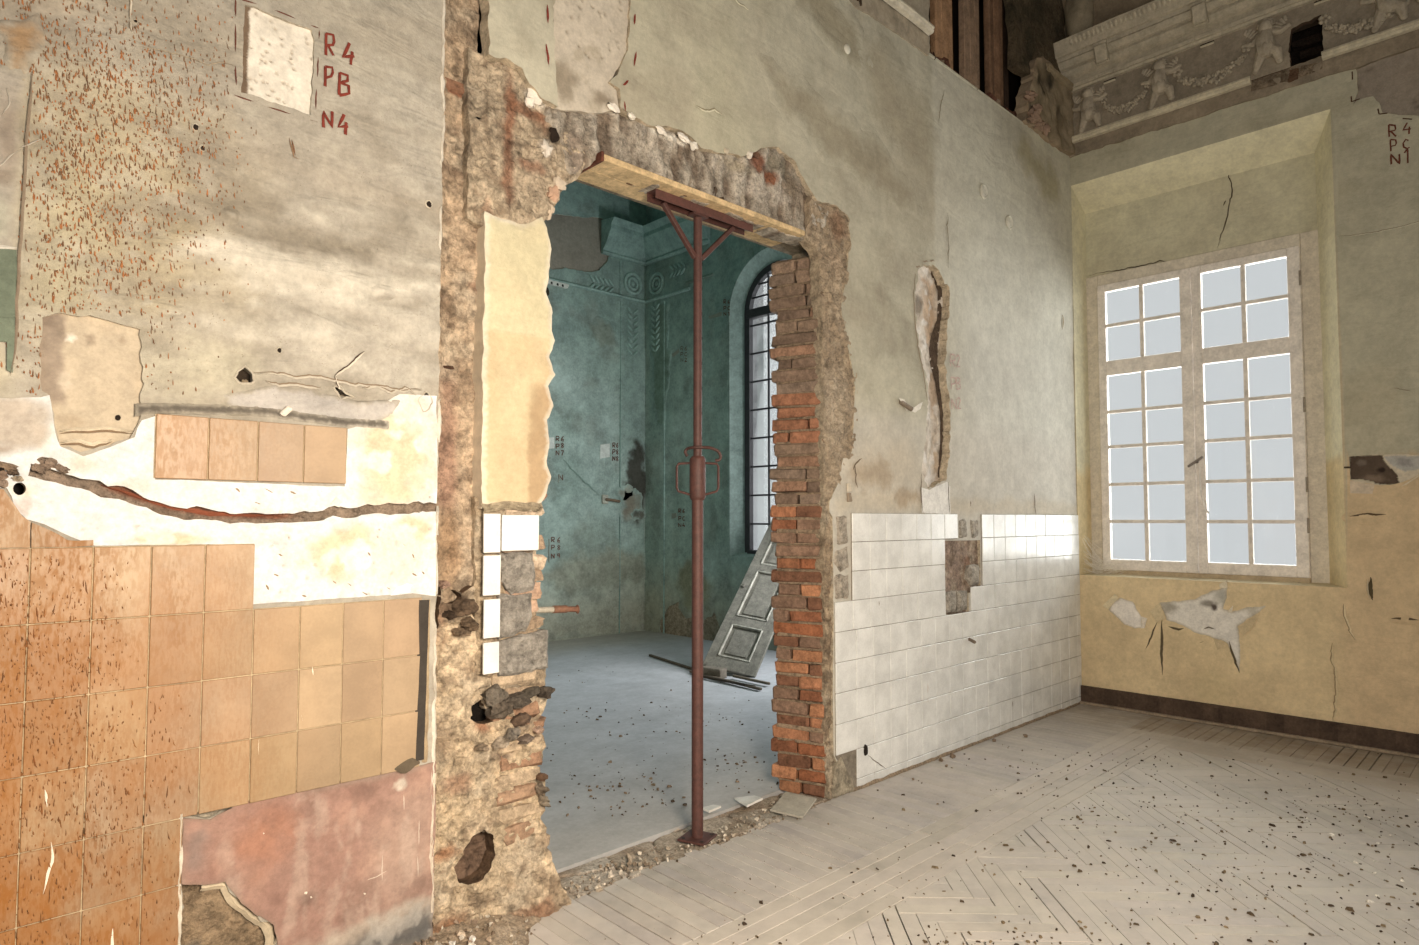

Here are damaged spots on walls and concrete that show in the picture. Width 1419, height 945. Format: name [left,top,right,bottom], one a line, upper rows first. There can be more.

peeling [655,125,699,151]
crack [1217,175,1233,248]
flaking render [0,0,637,945]
peeling [1344,454,1419,494]
spalling [945,519,980,614]
peeling [1102,580,1265,674]